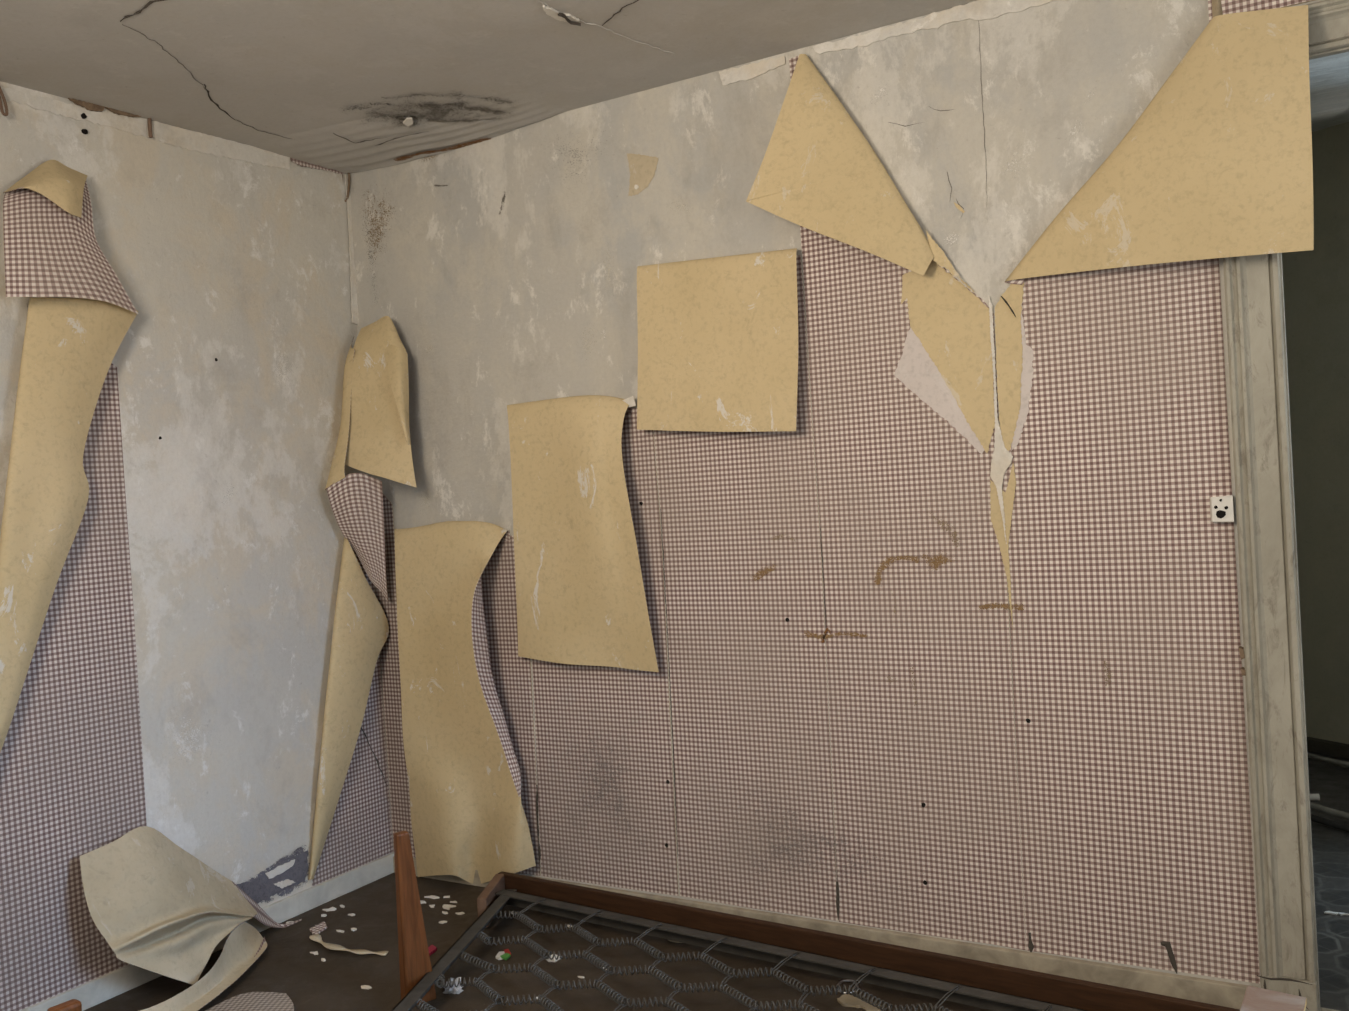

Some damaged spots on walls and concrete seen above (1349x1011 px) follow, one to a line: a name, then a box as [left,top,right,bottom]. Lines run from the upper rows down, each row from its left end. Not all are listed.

crack [120,0,290,139]
flaking render [719,56,786,86]